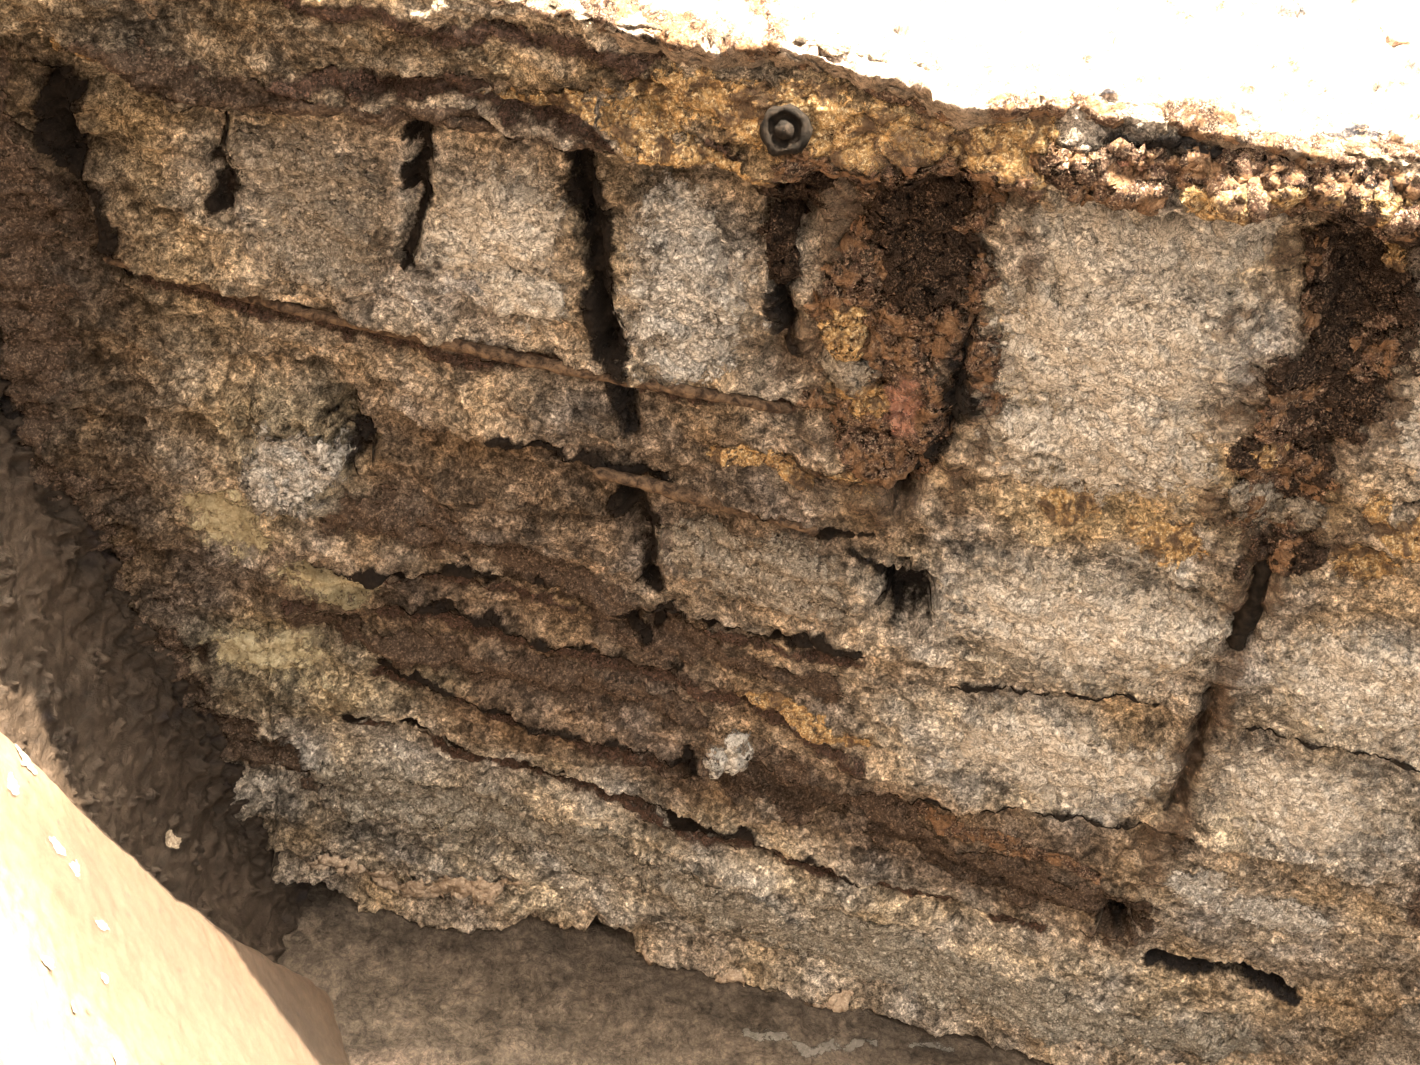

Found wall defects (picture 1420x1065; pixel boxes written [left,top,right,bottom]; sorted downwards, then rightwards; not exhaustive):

spalling [223,116,385,291]
rust [133,274,559,373]
spalling [415,160,568,334]
spalling [611,166,771,383]
spalling [974,201,1289,514]
rust [264,0,1420,934]
spalling [655,514,860,627]
spalling [933,696,1181,813]
spalling [937,548,1234,689]
spalling [1211,745,1405,859]
spalling [1261,620,1420,761]
spalling [306,762,1294,1065]